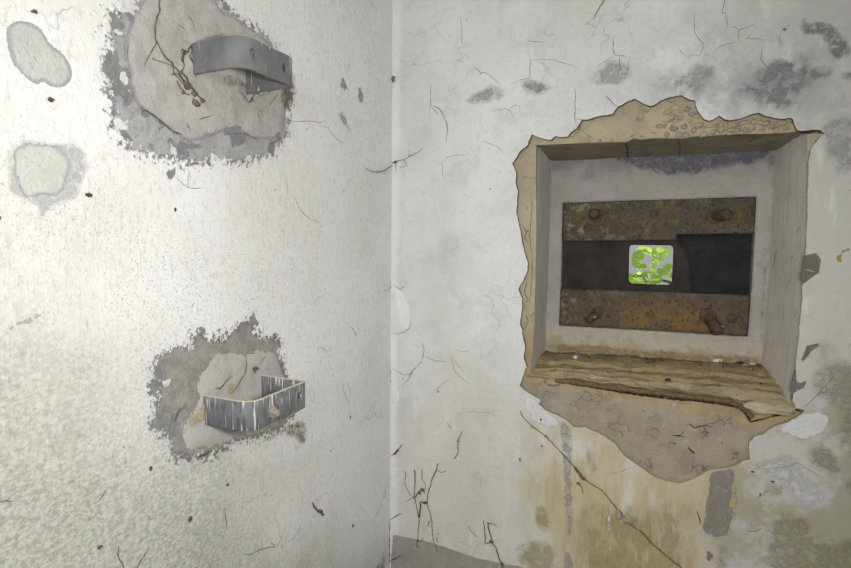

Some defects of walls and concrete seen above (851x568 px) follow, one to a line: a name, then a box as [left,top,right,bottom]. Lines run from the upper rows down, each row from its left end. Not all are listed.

peeling [95,0,297,179]
crack [477,41,629,84]
crack [680,0,781,70]
spalling [513,97,823,537]
peeling [142,311,298,470]
leakage [561,425,572,506]
leakage [589,514,679,568]
leakage [770,519,851,568]